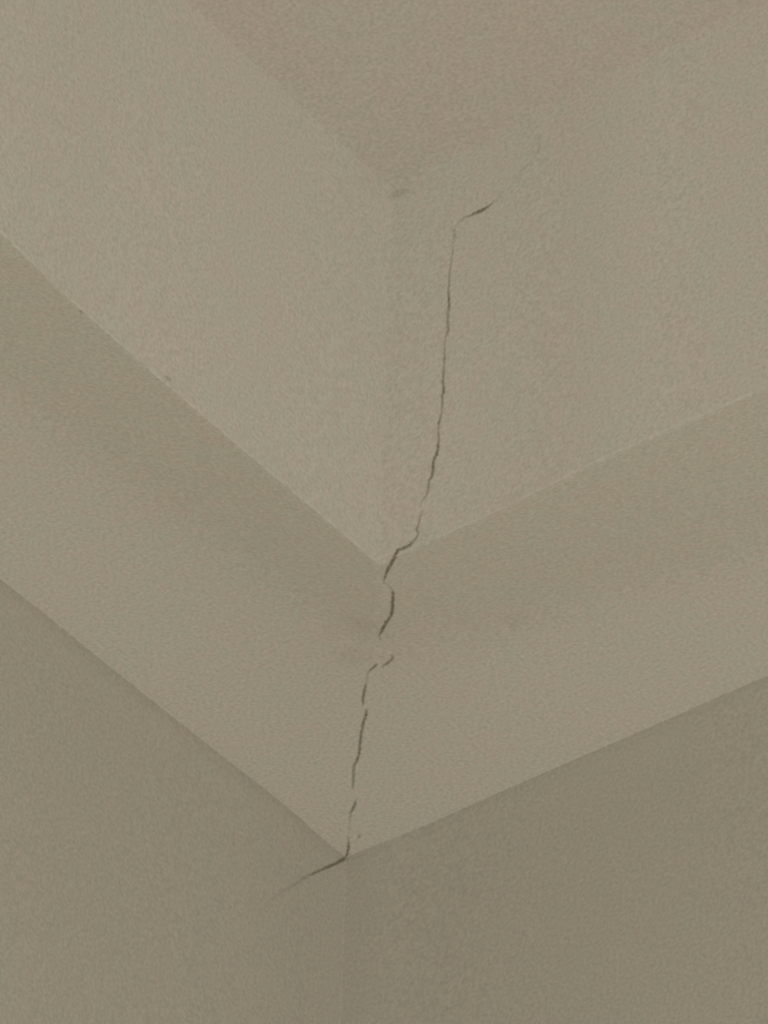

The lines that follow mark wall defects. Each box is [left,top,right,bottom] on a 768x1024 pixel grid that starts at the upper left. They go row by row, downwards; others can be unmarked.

crack [381,543,411,632]